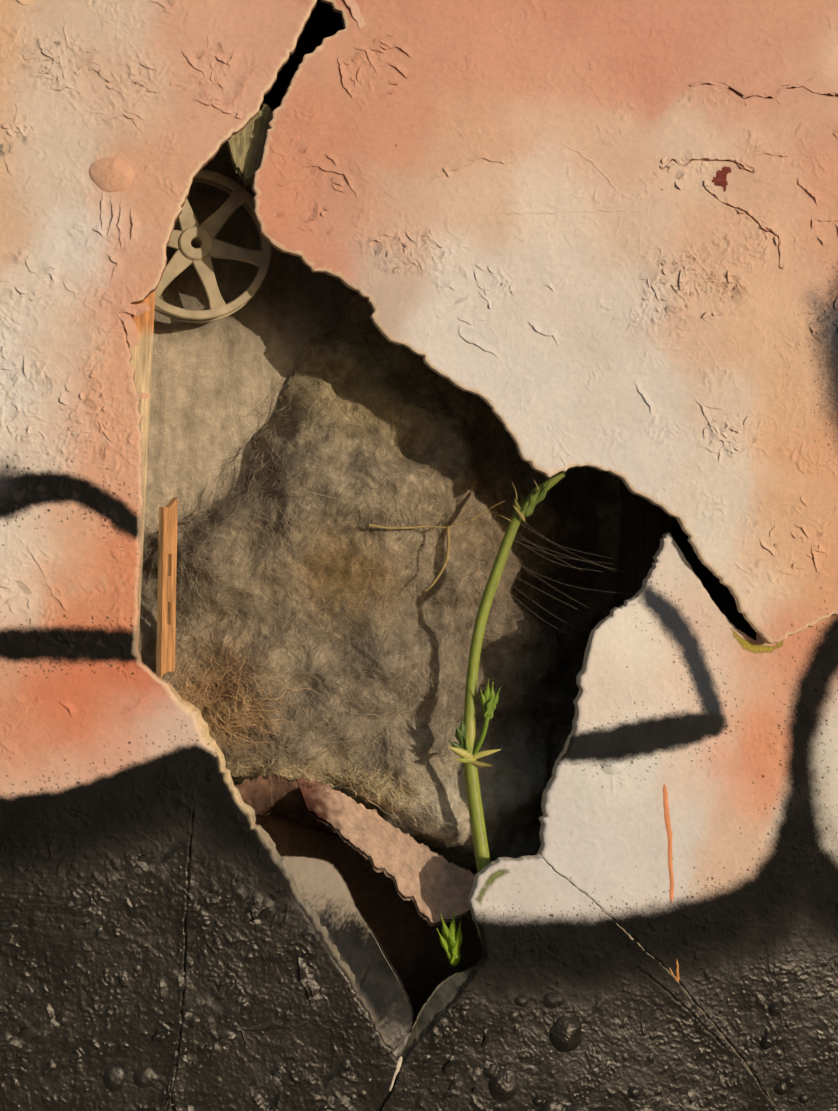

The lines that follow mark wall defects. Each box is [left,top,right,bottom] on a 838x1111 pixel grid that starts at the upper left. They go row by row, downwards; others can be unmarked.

spalling [259,0,366,112]
crack [689,77,838,104]
peeling [270,131,361,198]
peeling [657,149,790,268]
peeling [364,222,556,309]
peeling [638,243,747,322]
peeling [694,396,757,464]
spalling [672,517,742,631]
peeling [231,873,300,934]
crack [164,812,194,1111]
peeling [298,952,323,1011]
crack [542,857,780,1111]